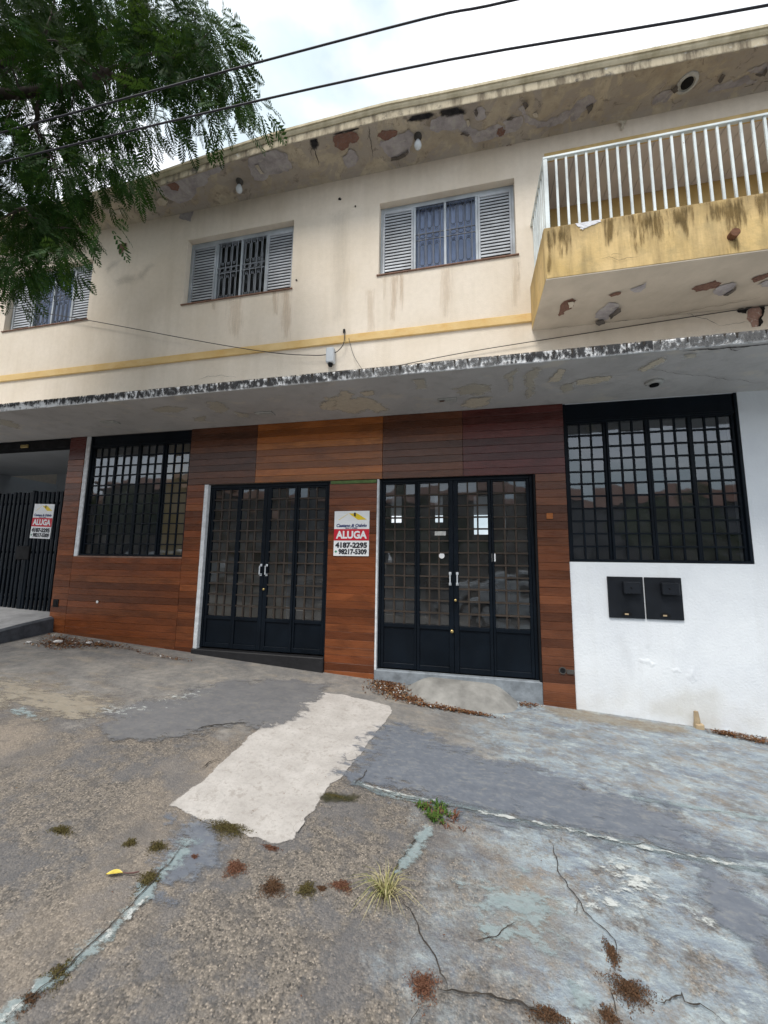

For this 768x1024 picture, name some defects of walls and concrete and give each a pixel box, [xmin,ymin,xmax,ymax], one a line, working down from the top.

peeling [430,107,523,146]
spalling [333,131,359,168]
water stain [604,218,613,242]
water stain [673,207,694,234]
water stain [710,198,746,249]
peeling [692,280,737,296]
peeling [558,298,576,316]
spalling [737,305,765,327]
water stain [0,329,768,409]
crack [354,770,768,954]
crack [402,901,553,1019]
crack [656,992,724,1023]